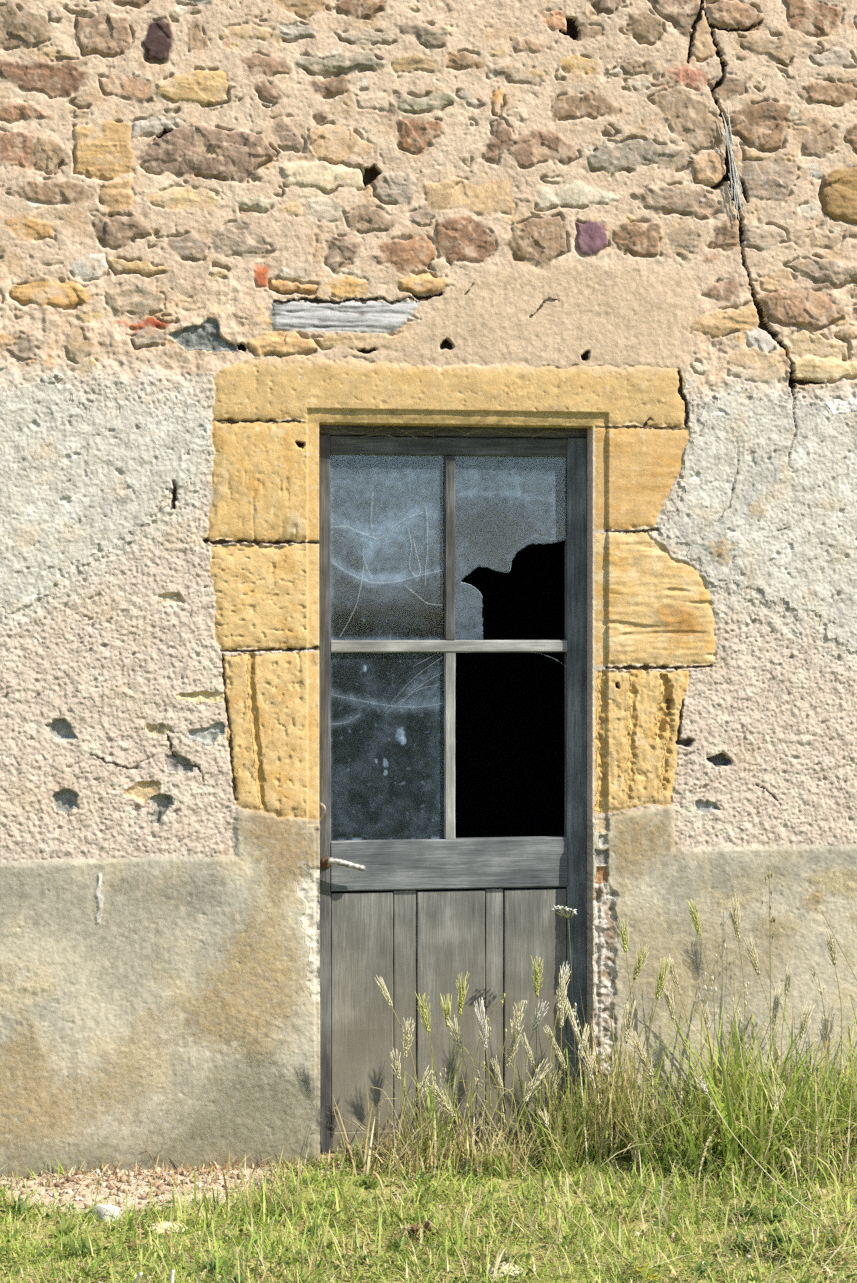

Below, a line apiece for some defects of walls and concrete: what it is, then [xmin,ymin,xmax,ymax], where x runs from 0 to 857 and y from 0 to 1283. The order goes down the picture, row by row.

crack [687,0,826,396]
crack [677,371,689,426]
spalling [46,719,77,739]
spalling [52,789,77,813]
spalling [124,751,193,823]
spalling [145,722,226,745]
spalling [625,670,639,802]
spalling [654,673,694,792]
spalling [695,800,719,813]
spalling [706,753,731,767]
damp [96,872,104,923]
peeling [592,670,620,1131]